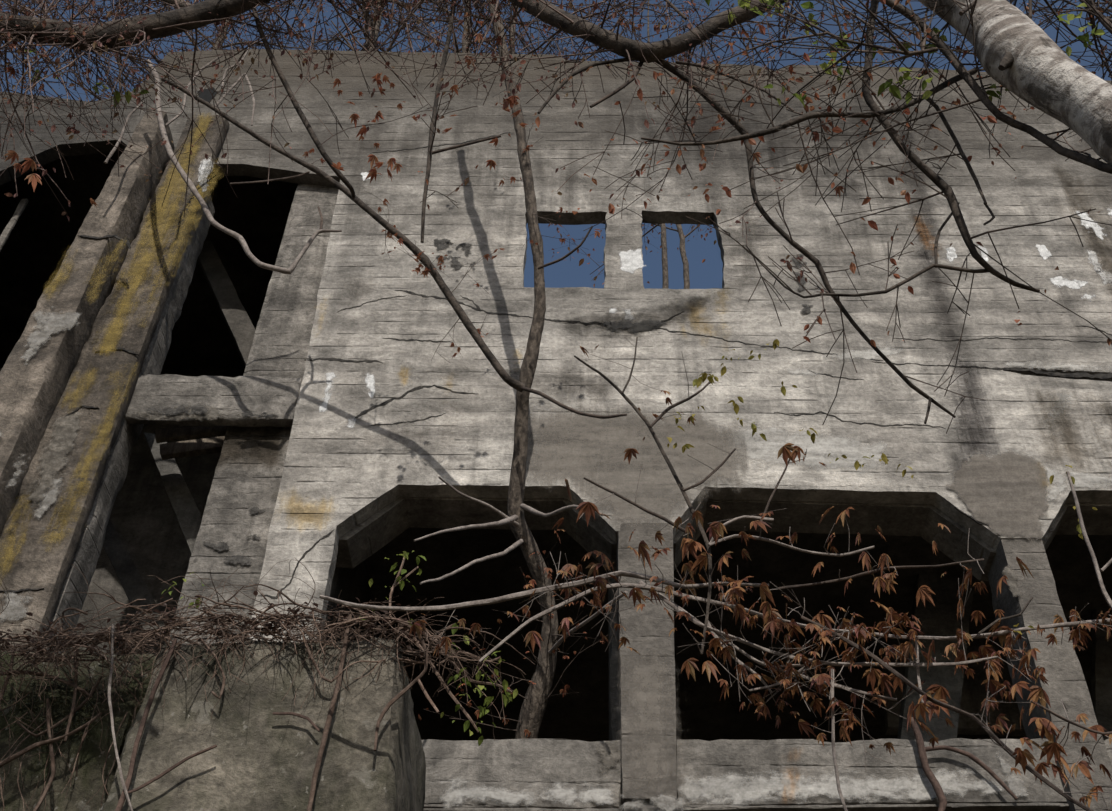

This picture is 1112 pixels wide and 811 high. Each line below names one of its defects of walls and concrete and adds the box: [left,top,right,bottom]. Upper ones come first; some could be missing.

damp [101,117,216,353]
damp [1035,244,1052,260]
damp [1076,211,1106,239]
damp [1050,251,1112,299]
crack [338,290,607,327]
crack [653,312,1112,382]
crack [355,385,475,426]